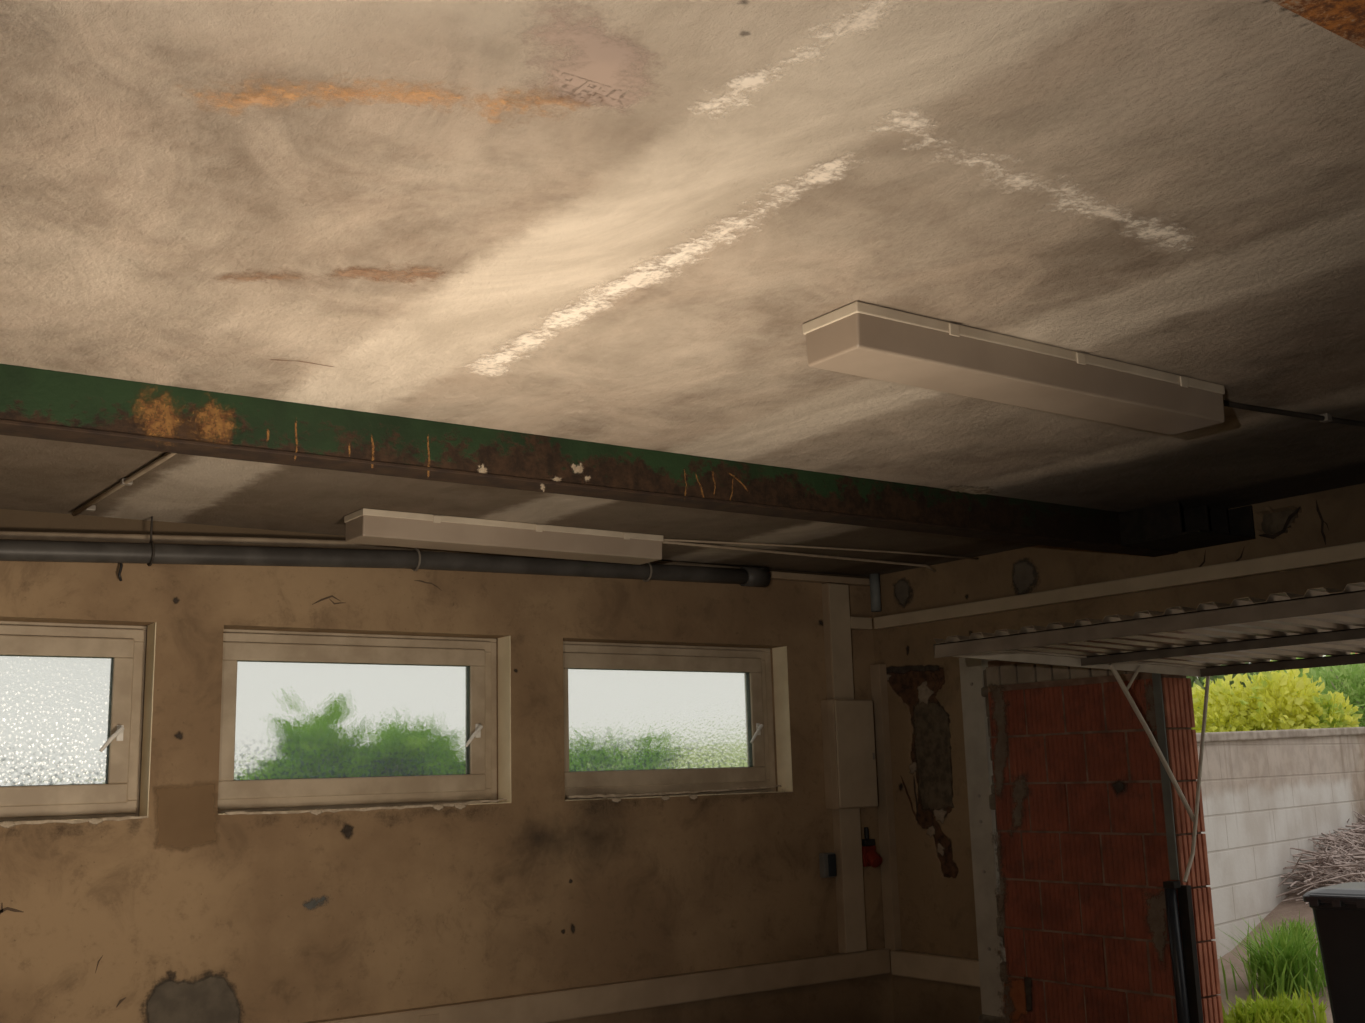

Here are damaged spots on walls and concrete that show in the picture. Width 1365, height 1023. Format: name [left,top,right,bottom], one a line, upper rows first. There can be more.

leakage [537,10,649,107]
corrosion [336,267,442,282]
corrosion [134,391,235,444]
flaking render [886,646,959,878]